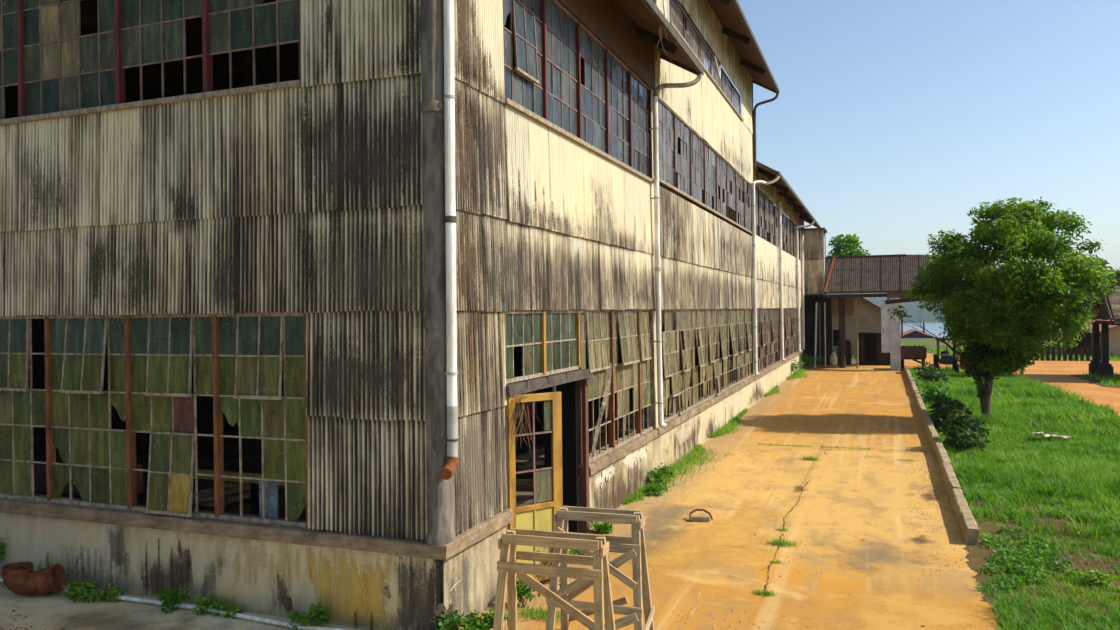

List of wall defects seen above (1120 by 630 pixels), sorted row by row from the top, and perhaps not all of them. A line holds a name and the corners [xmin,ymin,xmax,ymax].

water stain [24,153,77,238]
water stain [169,178,202,231]
water stain [454,0,620,333]
water stain [210,228,244,312]
water stain [66,527,470,630]
crack [763,480,810,598]